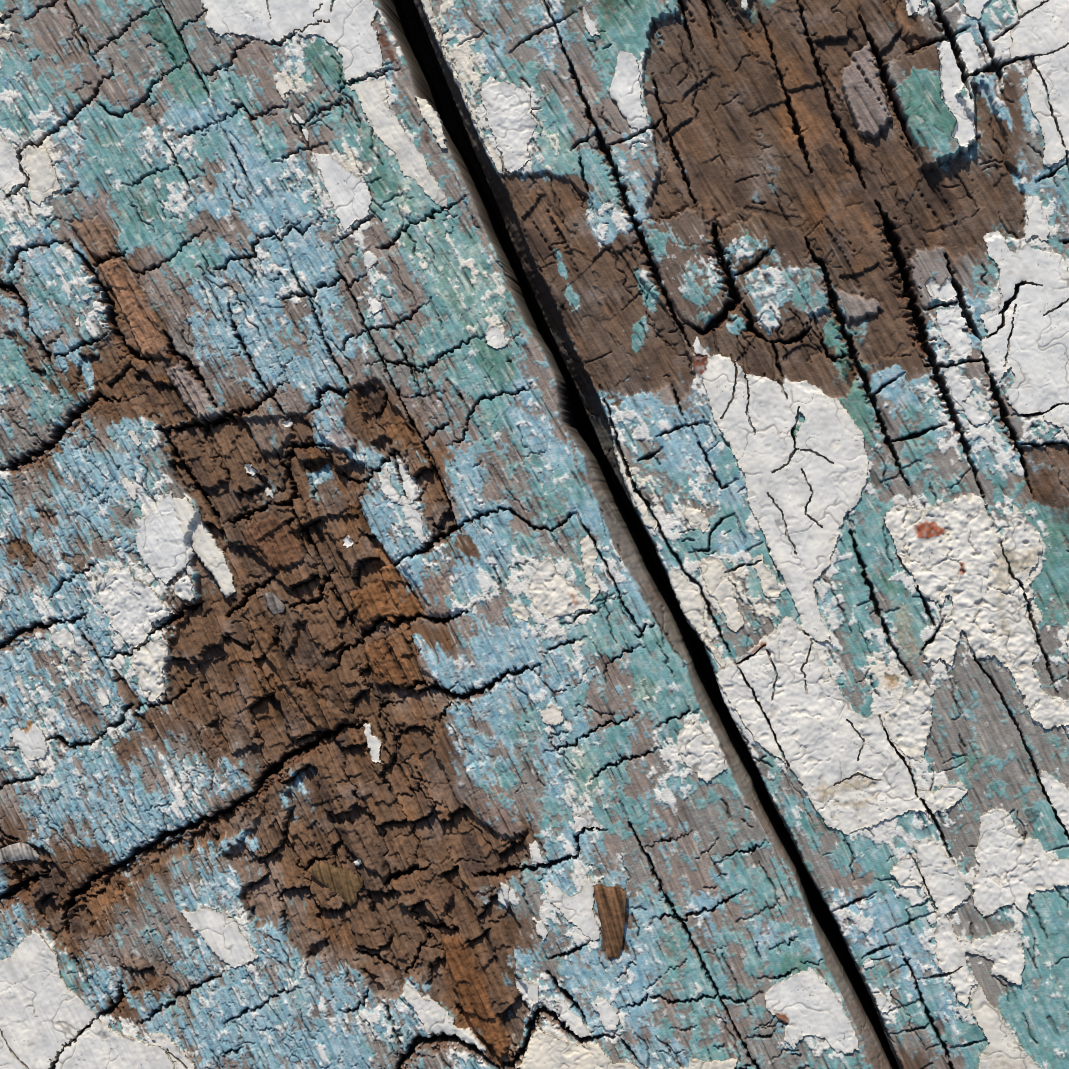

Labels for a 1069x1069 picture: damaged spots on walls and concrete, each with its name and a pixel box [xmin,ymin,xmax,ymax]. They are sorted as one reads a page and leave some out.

peeling [502,171,696,406]
peeling [642,0,1050,432]
peeling [0,217,531,1069]
crack [0,0,655,1069]
crack [510,0,1069,839]
peeling [794,413,805,437]
peeling [1015,444,1069,626]
crack [833,715,955,865]
peeling [532,917,548,940]
crack [862,853,987,1069]